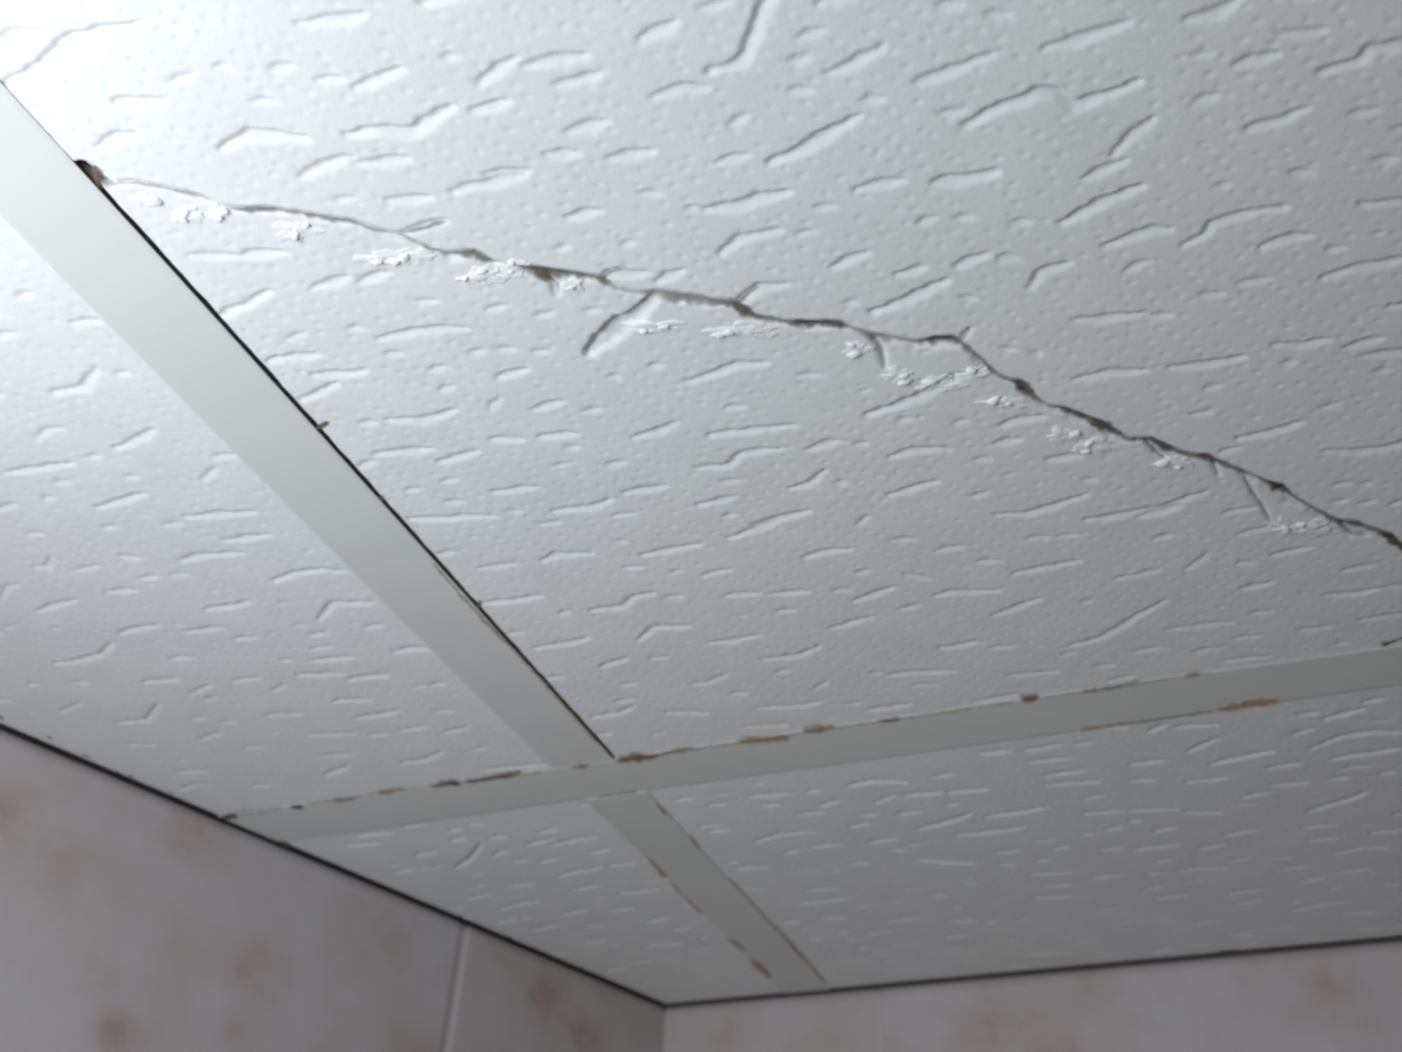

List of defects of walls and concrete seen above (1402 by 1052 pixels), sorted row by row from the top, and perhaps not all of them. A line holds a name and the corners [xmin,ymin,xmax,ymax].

crack [74,162,105,185]
crack [233,207,353,221]
crack [446,251,490,260]
crack [525,266,608,283]
crack [676,294,874,336]
crack [914,336,1402,550]
rust [1022,673,1199,702]
rust [1081,700,1277,730]
rust [726,726,840,745]
rust [618,747,707,762]
rust [322,771,527,802]
rust [729,879,825,982]